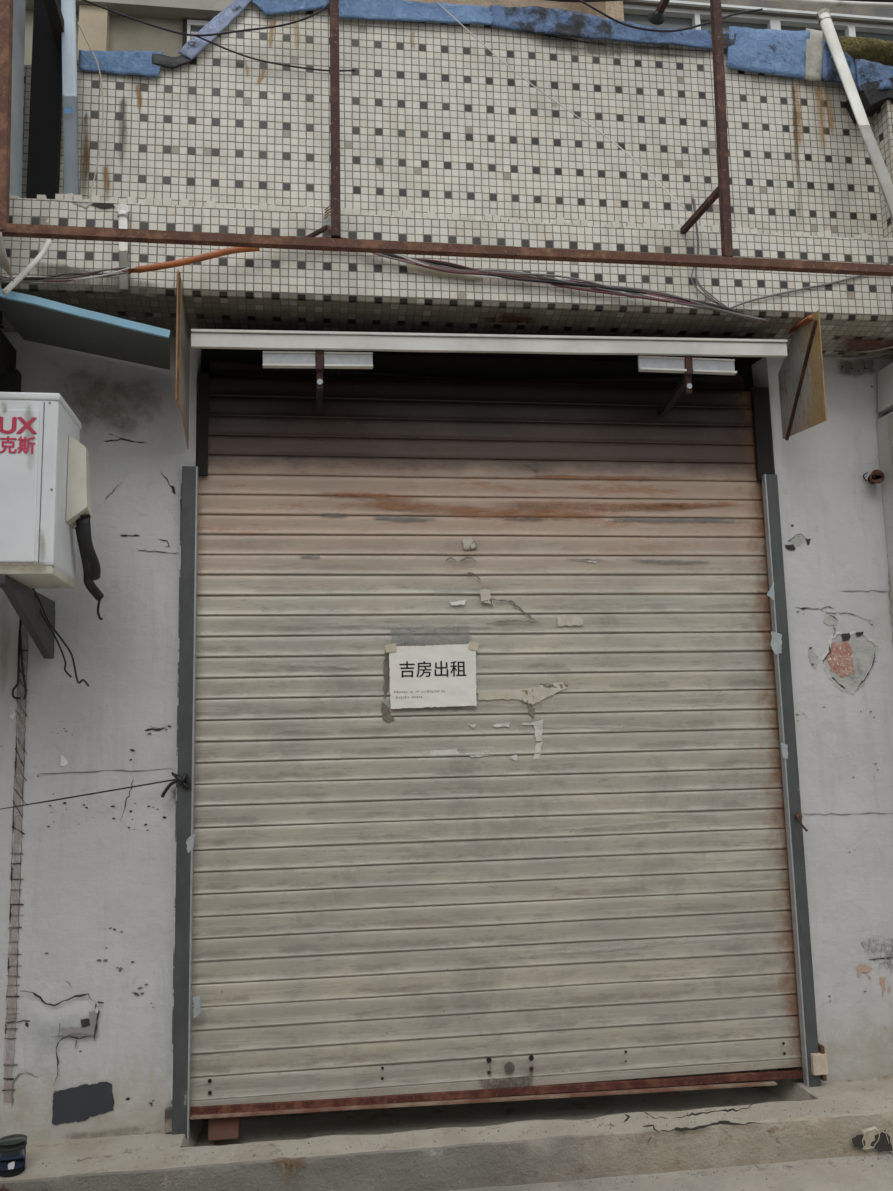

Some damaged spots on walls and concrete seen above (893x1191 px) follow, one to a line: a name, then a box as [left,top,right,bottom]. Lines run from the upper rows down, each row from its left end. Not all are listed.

rust [792,84,801,174]
spalling [809,615,879,695]
peeling [857,939,893,997]
crack [862,943,893,970]
crack [6,981,104,1105]
crack [624,1102,761,1142]